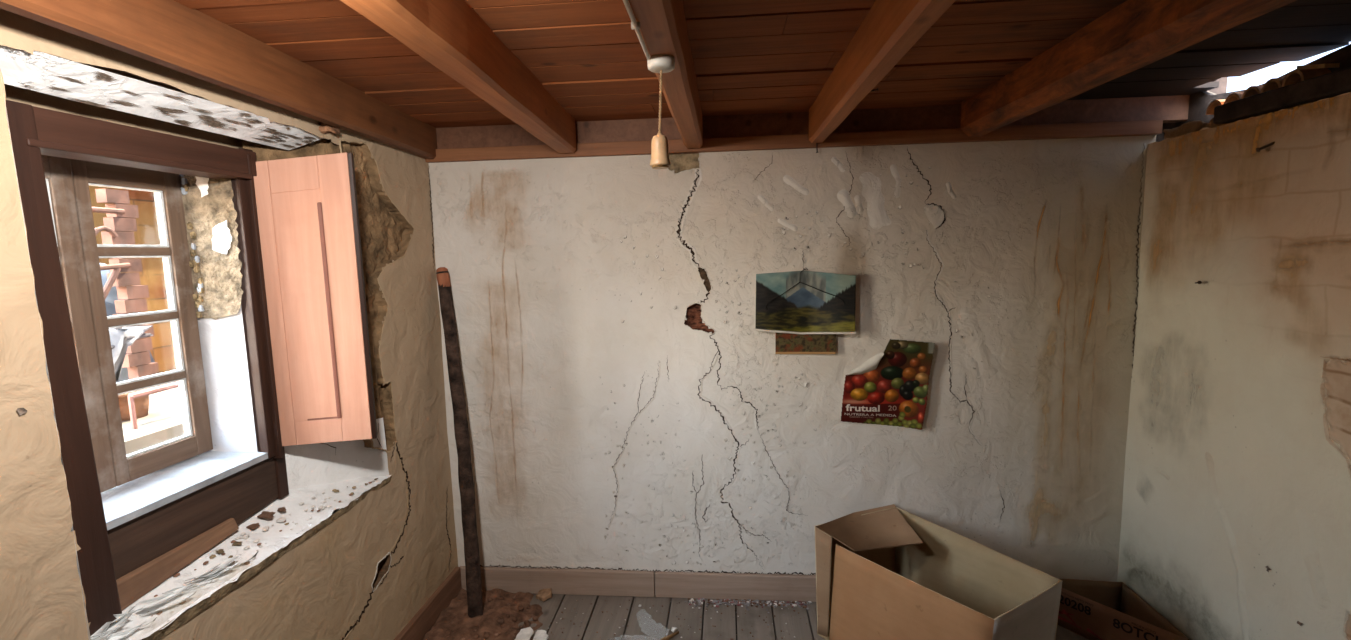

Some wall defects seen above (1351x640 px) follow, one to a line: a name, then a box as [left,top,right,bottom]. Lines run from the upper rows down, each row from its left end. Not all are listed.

spalling [22,71,414,454]
crack [676,169,710,303]
spalling [673,266,751,336]
crack [836,153,854,246]
crack [907,148,982,446]
crack [342,423,411,640]
crack [446,334,816,575]
peeling [1320,360,1351,477]